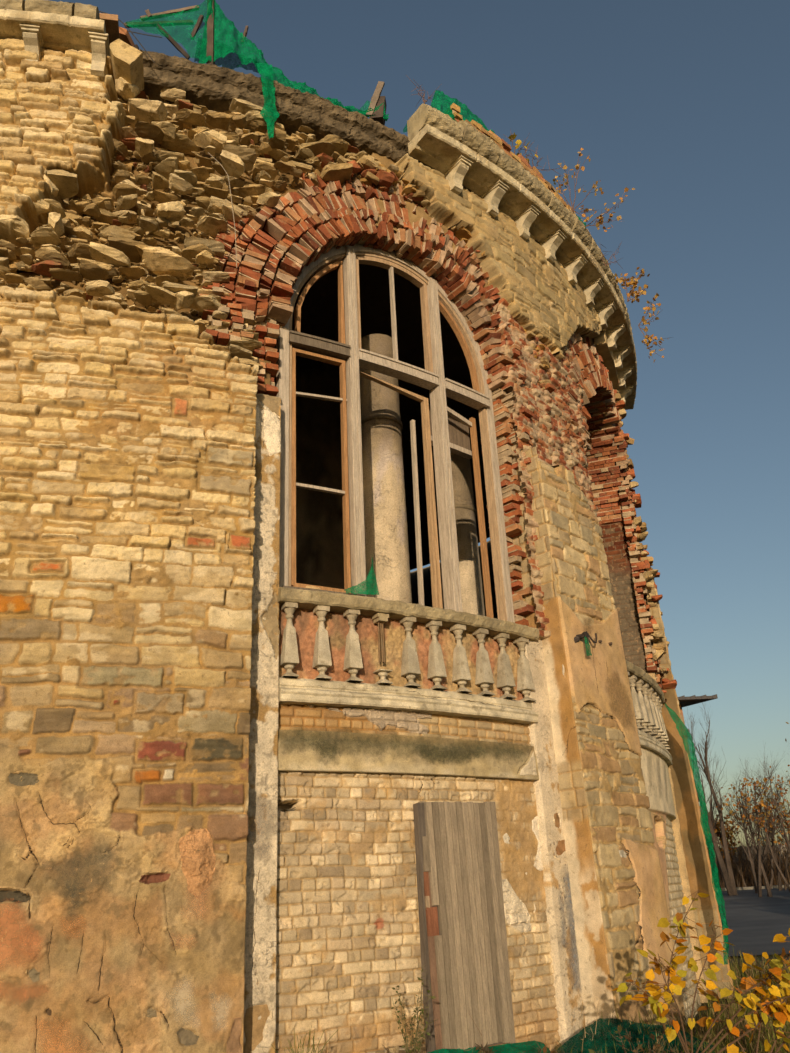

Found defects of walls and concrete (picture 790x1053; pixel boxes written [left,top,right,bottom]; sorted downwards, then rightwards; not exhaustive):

spalling [614,380,677,693]
spalling [8,771,39,786]
crack [16,795,91,919]
crack [133,891,176,960]
crack [76,930,123,1053]